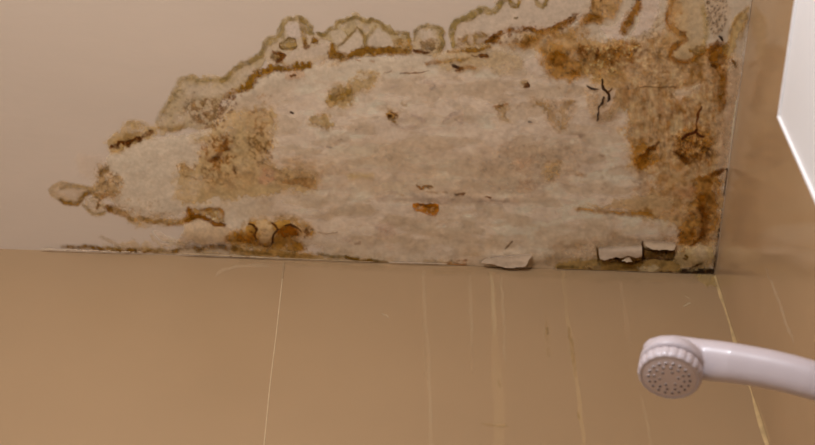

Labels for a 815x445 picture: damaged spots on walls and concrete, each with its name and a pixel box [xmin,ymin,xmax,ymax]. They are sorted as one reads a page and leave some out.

peeling [106,0,721,274]
damp [157,0,748,286]
crack [587,79,612,121]
crack [681,106,704,140]
peeling [695,0,752,197]
damp [59,163,123,215]
damp [66,244,388,263]